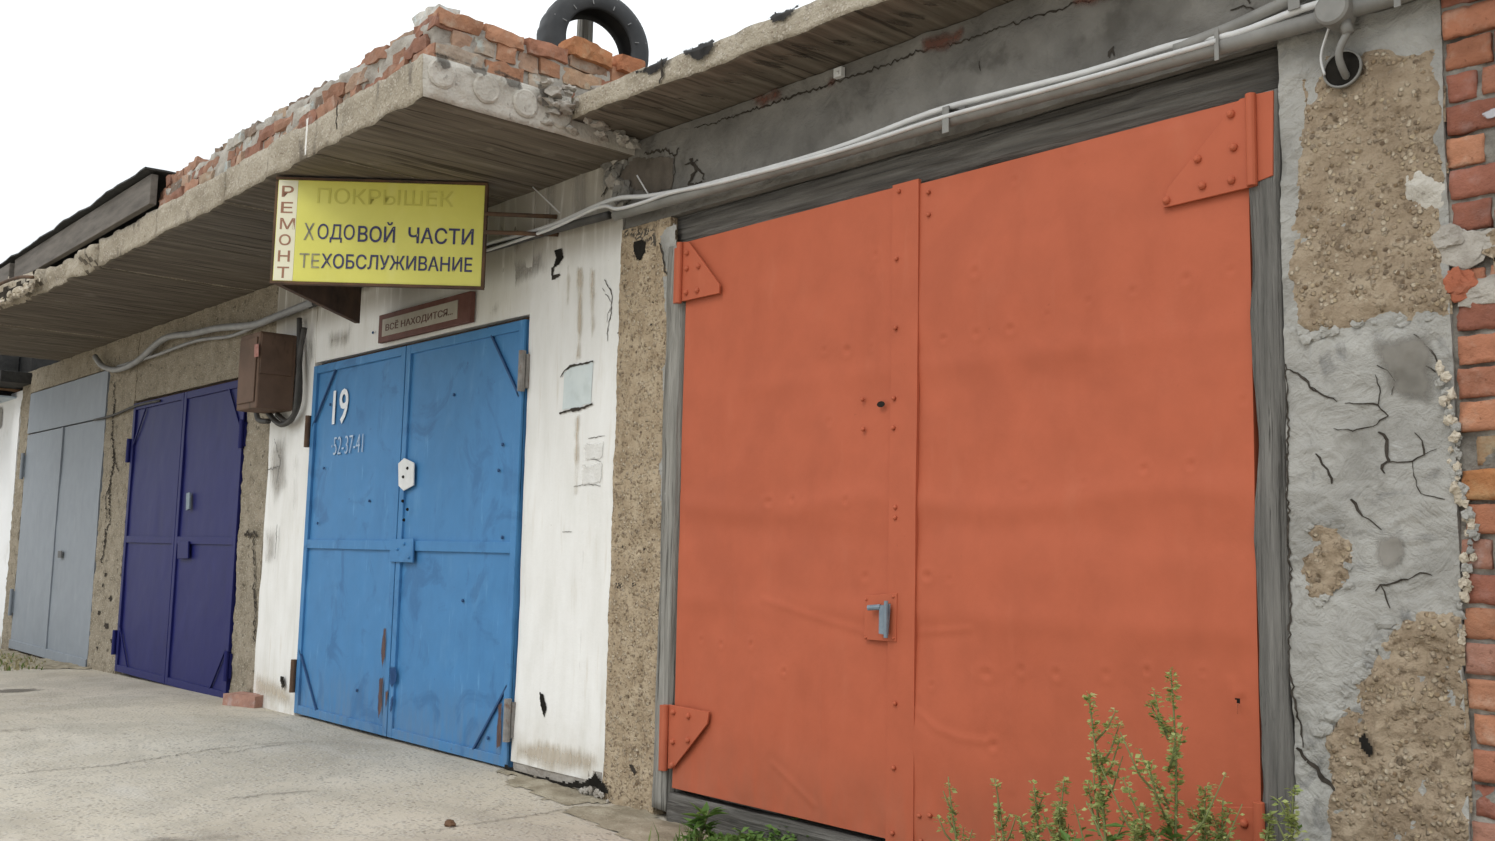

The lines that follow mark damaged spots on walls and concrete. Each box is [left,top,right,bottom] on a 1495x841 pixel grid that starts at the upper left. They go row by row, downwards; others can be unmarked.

spalling [0,271,40,306]
crack [601,1,1090,197]
spalling [1288,49,1495,345]
crack [1413,334,1438,373]
corrosion [378,628,388,718]
crack [1284,364,1445,791]
spalling [1301,360,1480,841]